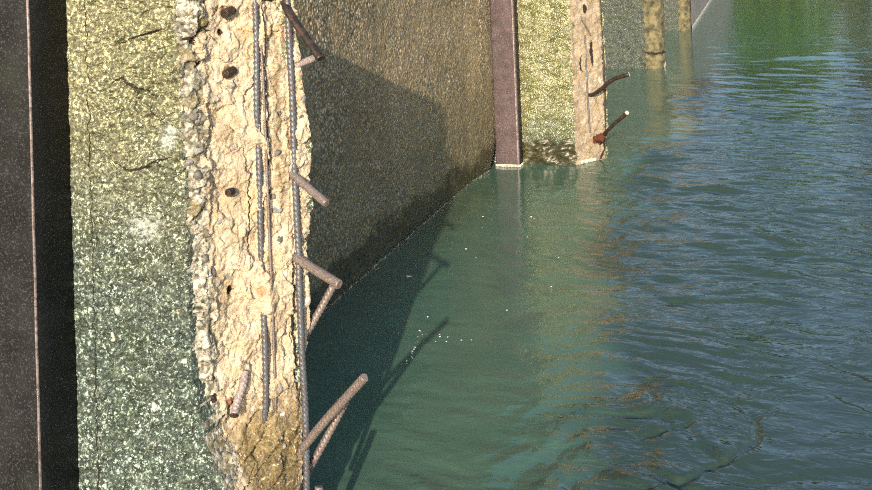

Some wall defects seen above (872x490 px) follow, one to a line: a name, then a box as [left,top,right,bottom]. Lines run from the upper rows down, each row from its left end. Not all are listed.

spalling [172,0,313,490]
spalling [569,0,607,165]